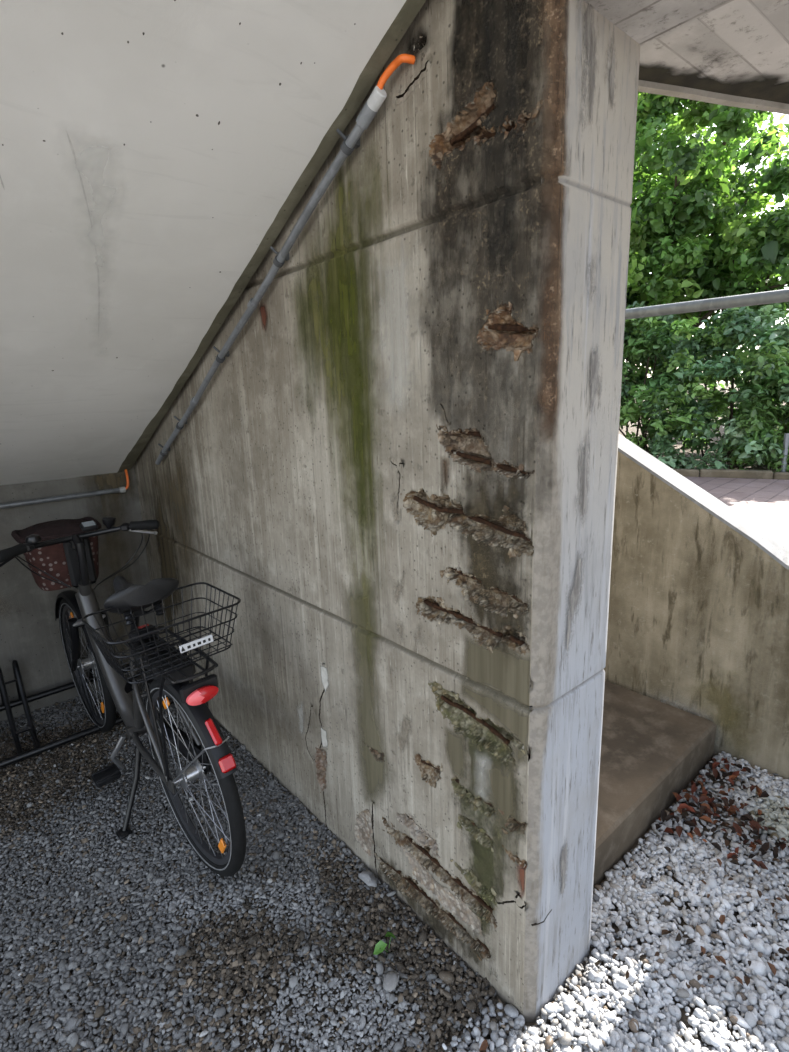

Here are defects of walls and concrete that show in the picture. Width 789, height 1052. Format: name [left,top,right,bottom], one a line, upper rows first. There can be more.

crack [395,58,432,105]
water stain [406,29,427,58]
water stain [581,4,615,126]
water stain [425,0,566,516]
spalling [436,424,535,479]
spalling [393,488,534,557]
spalling [416,568,530,655]
water stain [467,534,515,595]
water stain [567,557,584,652]
crack [303,663,330,831]
spalling [428,682,525,767]
spalling [375,812,497,961]